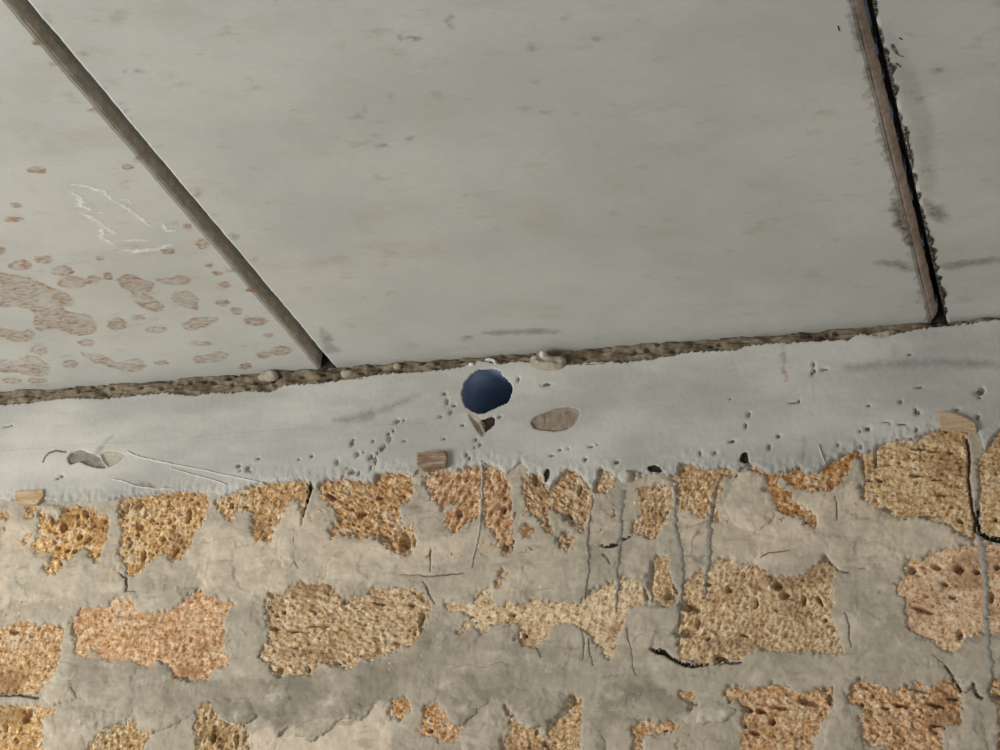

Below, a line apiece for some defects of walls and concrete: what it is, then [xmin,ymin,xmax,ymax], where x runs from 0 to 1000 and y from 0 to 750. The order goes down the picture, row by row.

damp [871,0,947,318]
spalling [69,451,124,468]
spalling [336,419,405,475]
spalling [462,412,501,460]
crack [966,440,1000,543]
crack [601,536,631,564]
crack [626,627,743,676]